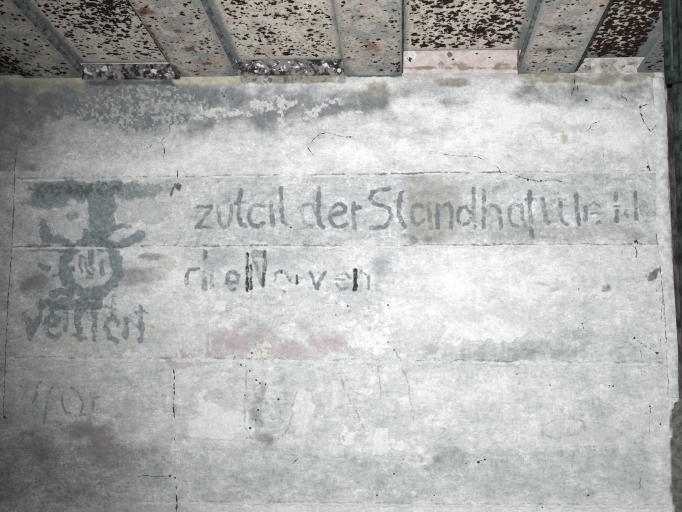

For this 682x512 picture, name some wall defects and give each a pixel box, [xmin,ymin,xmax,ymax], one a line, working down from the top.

damp [440,79,466,87]
damp [0,75,345,155]
damp [250,85,392,129]